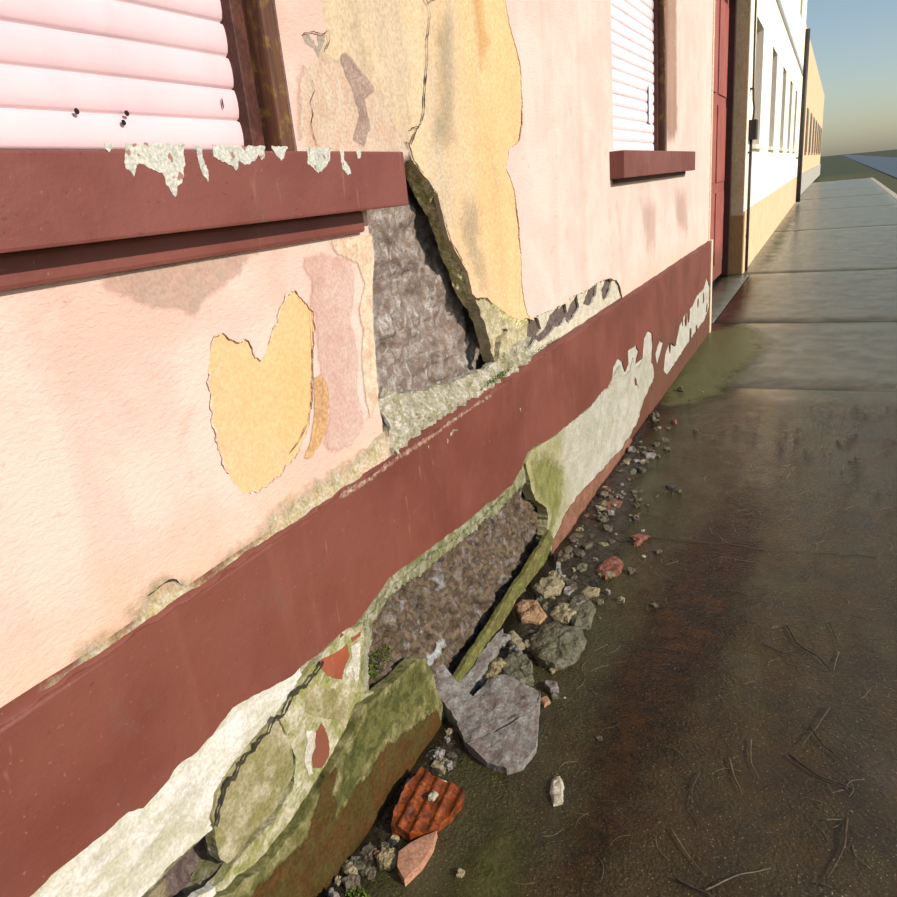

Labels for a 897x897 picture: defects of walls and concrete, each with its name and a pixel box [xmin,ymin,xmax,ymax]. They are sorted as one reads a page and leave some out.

crack [410,0,432,144]
peeling [124,142,185,197]
peeling [196,0,622,569]
water stain [662,326,766,406]
flaking render [30,279,709,897]
crack [215,661,324,827]